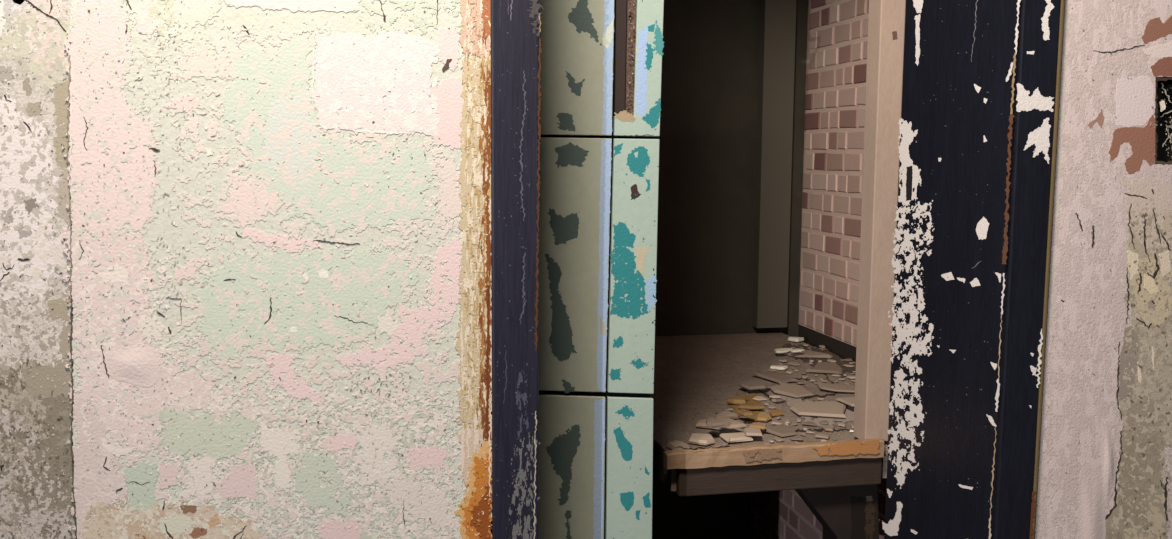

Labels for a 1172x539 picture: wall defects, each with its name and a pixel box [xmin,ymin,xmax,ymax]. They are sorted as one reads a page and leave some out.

crack [1093,45,1145,55]
peeling [0,0,491,539]
corrosion [454,0,492,539]
peeling [879,118,956,536]
peeling [941,272,980,287]
peeling [976,217,989,240]
spalling [986,272,1005,539]